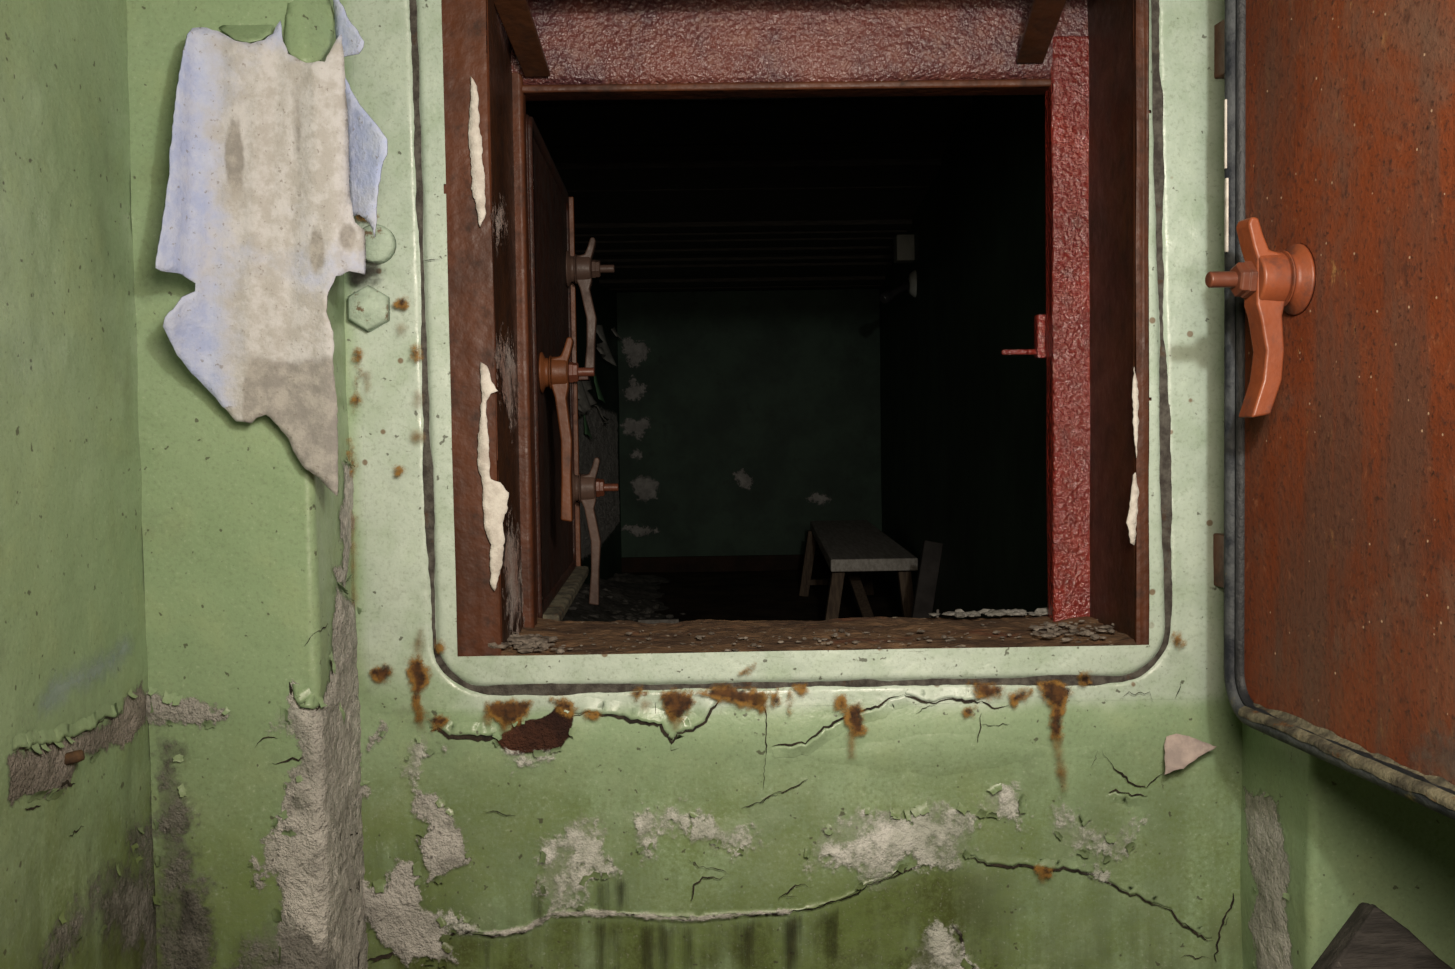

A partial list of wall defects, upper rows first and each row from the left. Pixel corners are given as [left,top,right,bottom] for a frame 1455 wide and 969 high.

peeling [155,0,791,969]
rust [370,641,449,729]
crack [426,714,498,742]
rust [485,697,600,729]
crack [571,691,719,751]
rust [661,666,808,722]
crack [743,685,1009,808]
rust [963,672,1092,745]
flaking render [7,681,231,969]
flaking render [804,782,1027,890]
flaking render [901,919,979,969]
crack [969,848,1234,960]